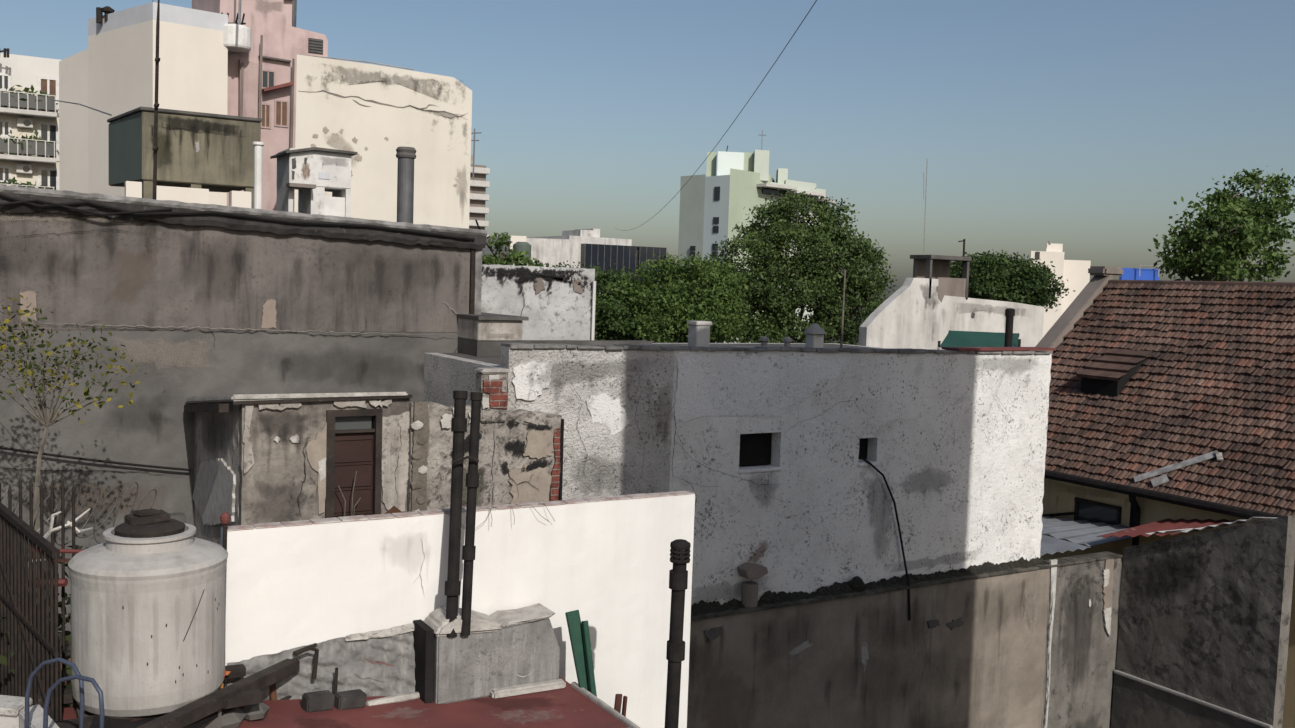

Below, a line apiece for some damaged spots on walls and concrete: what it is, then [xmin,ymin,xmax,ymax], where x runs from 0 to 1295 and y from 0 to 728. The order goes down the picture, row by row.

crack [301,90,465,119]
peeling [292,126,368,179]
damp [482,266,593,320]
spalling [440,361,553,429]
spalling [585,393,629,435]
peeling [193,402,302,526]
peeling [274,422,327,515]
peeling [333,399,410,512]
peeling [508,428,560,504]